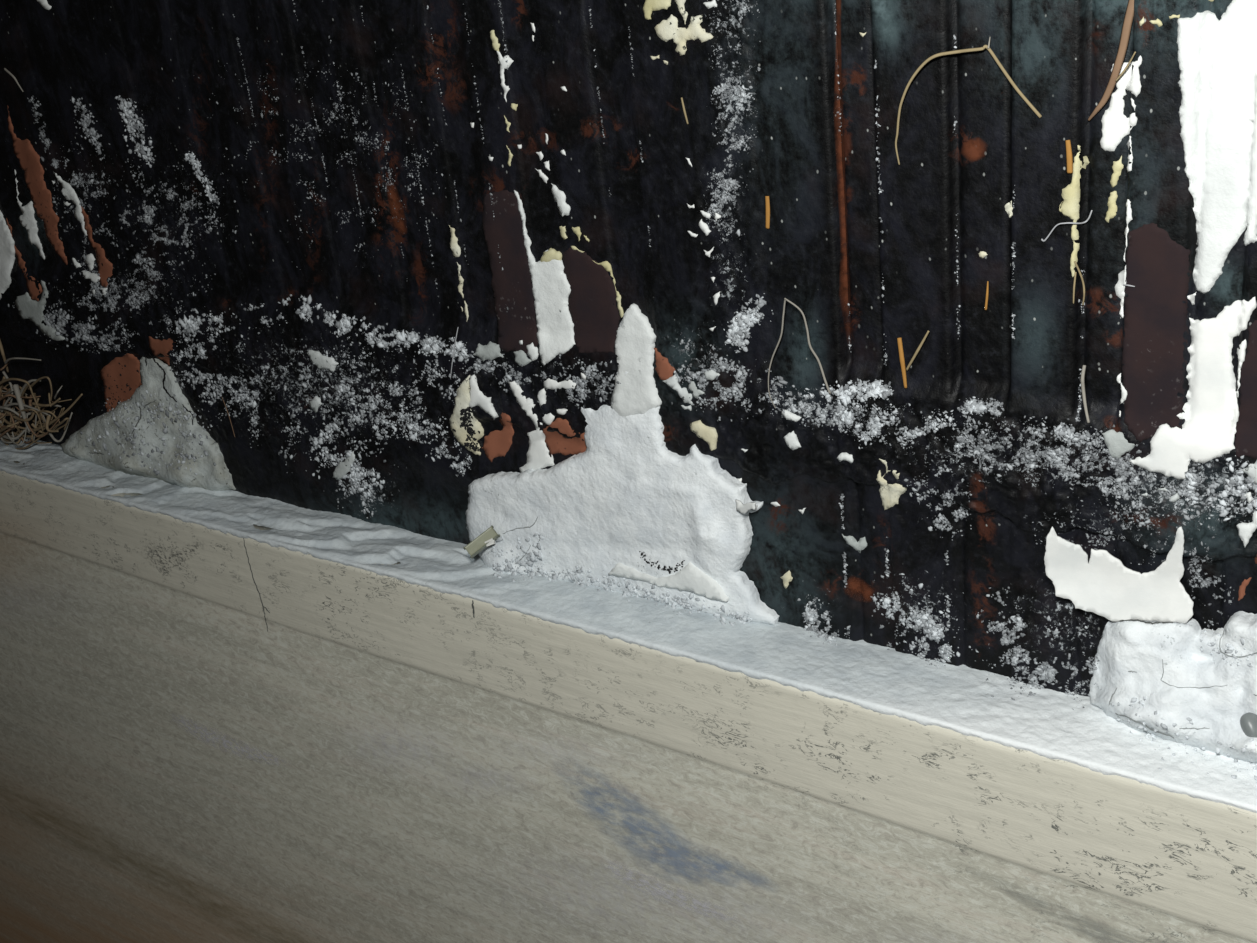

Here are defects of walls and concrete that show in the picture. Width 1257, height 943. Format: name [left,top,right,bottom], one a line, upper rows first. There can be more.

rust [836,0,849,303]
peeling [457,263,469,322]
peeling [482,190,539,361]
peeling [562,227,620,354]
peeling [1105,191,1196,443]
flaking render [537,389,587,455]
water stain [673,293,1257,628]
peeling [1234,320,1257,460]
crack [243,538,270,632]
water stain [797,595,851,646]
water stain [870,537,1100,710]
peeling [1044,526,1194,624]